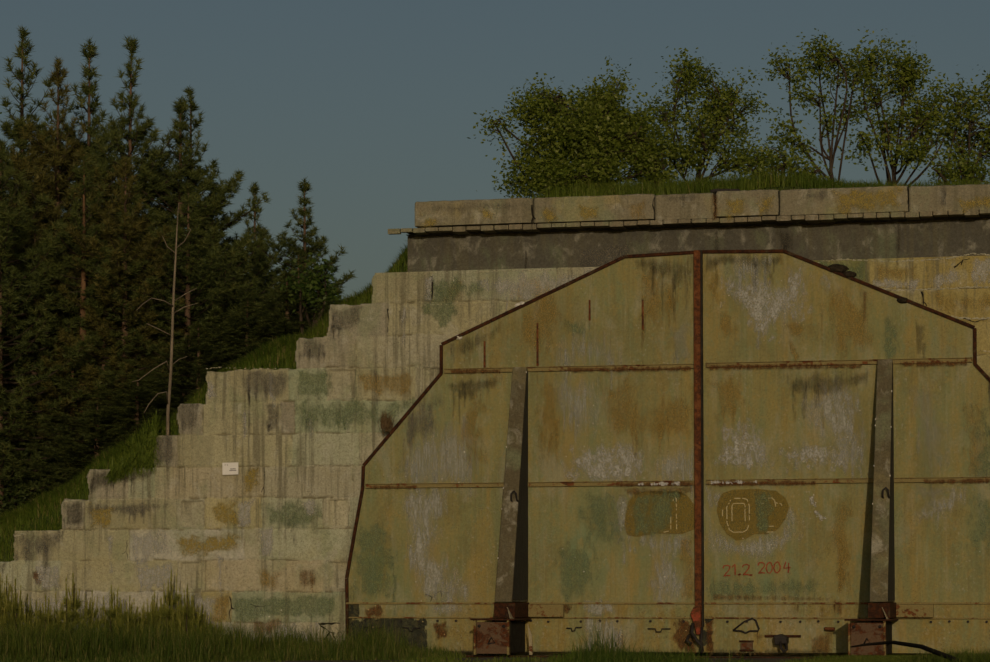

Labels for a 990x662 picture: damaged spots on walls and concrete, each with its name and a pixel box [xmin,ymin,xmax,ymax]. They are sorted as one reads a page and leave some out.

peeling [727,259,804,344]
peeling [566,445,680,486]